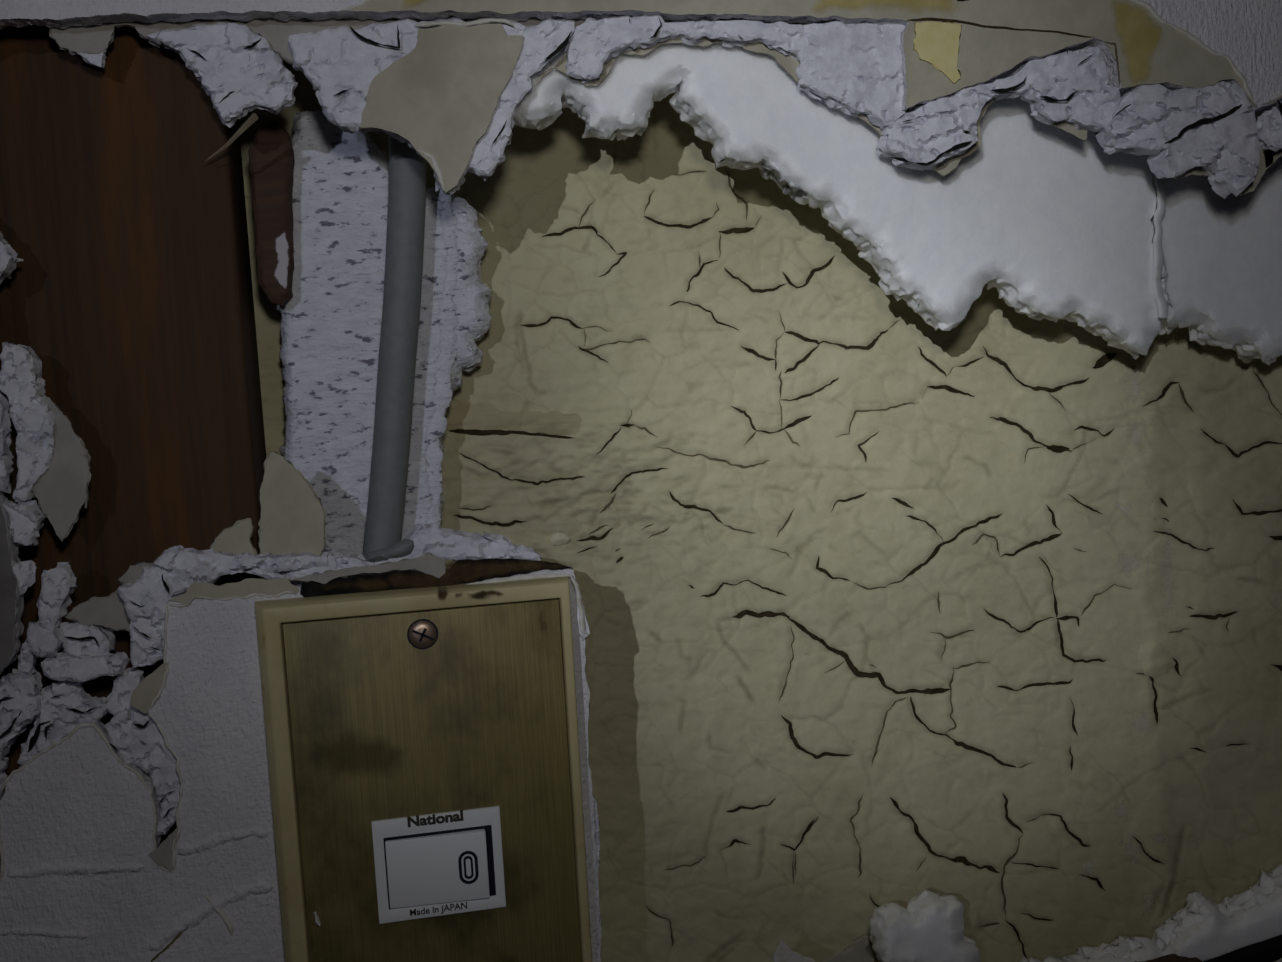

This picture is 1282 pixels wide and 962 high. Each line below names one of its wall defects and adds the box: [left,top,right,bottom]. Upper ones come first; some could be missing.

flaking render [61,47,107,68]
flaking render [146,15,1282,199]
flaking render [0,232,24,284]
flaking render [0,342,543,836]